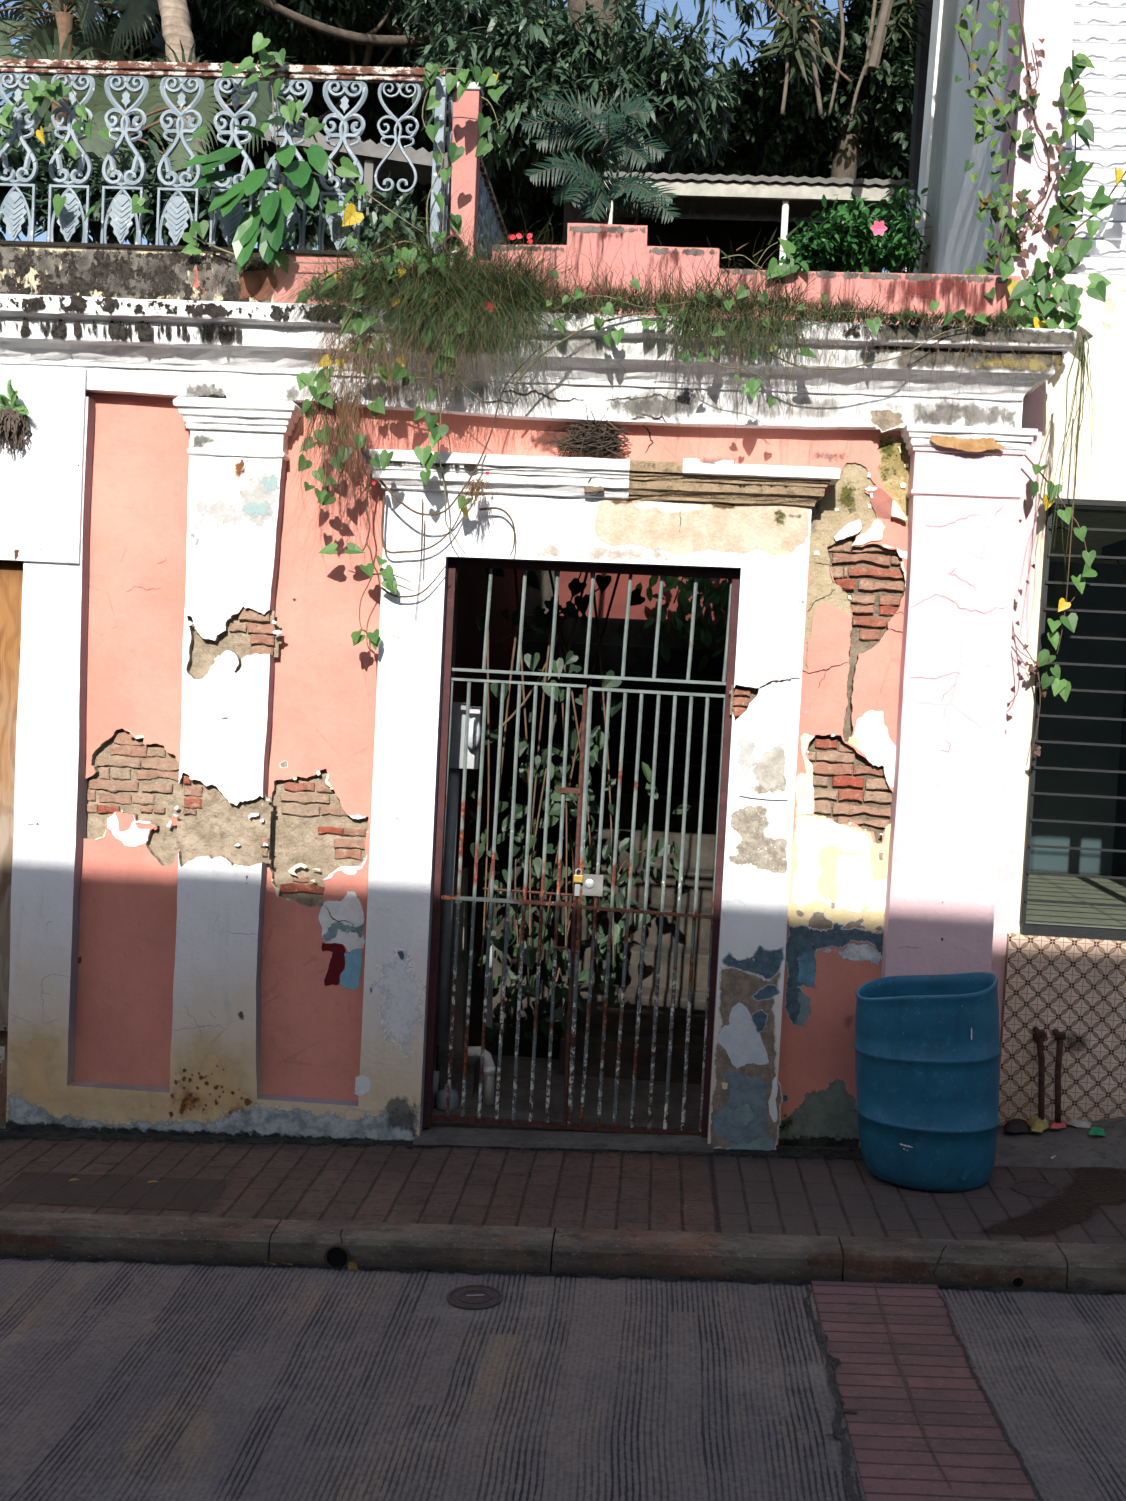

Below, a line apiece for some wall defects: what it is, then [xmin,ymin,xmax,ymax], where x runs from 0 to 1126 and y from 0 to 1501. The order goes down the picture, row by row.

mould [0,246,348,345]
mould [799,400,837,416]
mould [914,397,1015,428]
peeling [930,435,1005,452]
peeling [195,471,279,545]
crack [911,568,1006,613]
flaking render [186,606,283,679]
crack [910,672,961,701]
peeling [536,408,911,1151]
flaking render [86,729,369,990]
rust [168,1065,252,1118]
leakage [3,1048,418,1141]